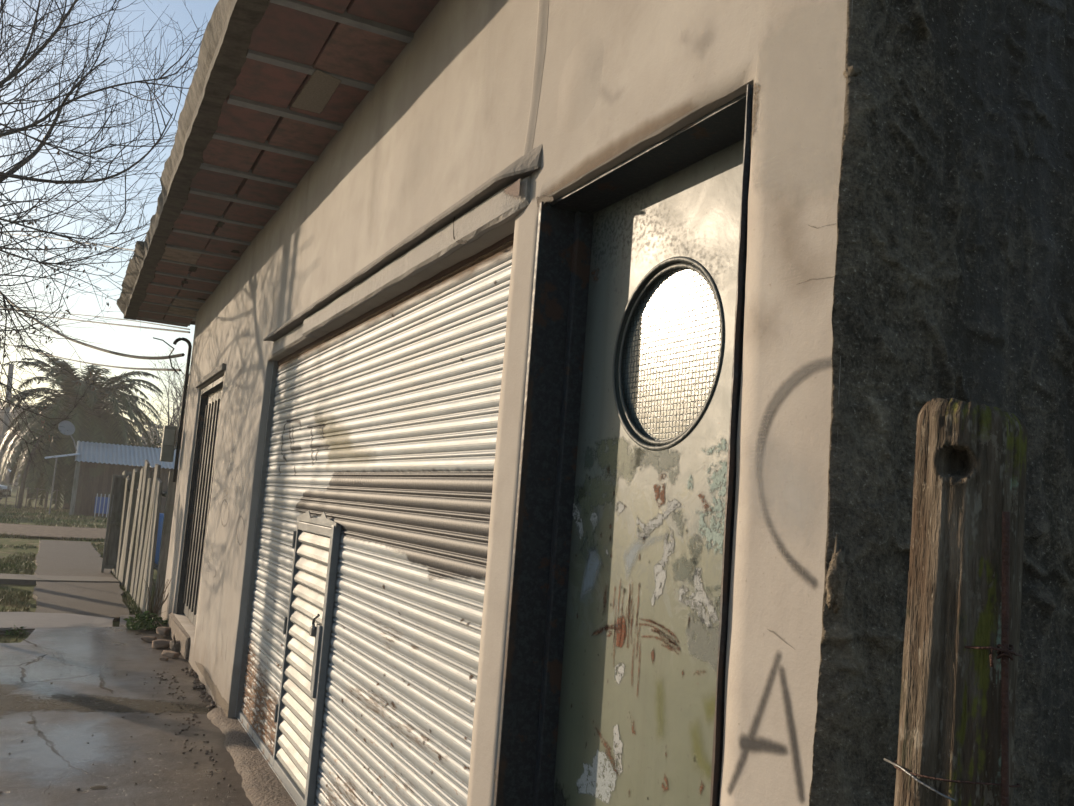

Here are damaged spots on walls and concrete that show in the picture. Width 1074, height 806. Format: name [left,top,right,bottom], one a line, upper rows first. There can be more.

peeling [572,436,693,561]
peeling [636,439,728,669]
leakage [0,627,122,714]
crack [18,639,131,694]
corrosion [241,629,279,754]
peeling [614,663,625,684]
corrosion [592,583,680,695]
peeling [576,724,623,803]